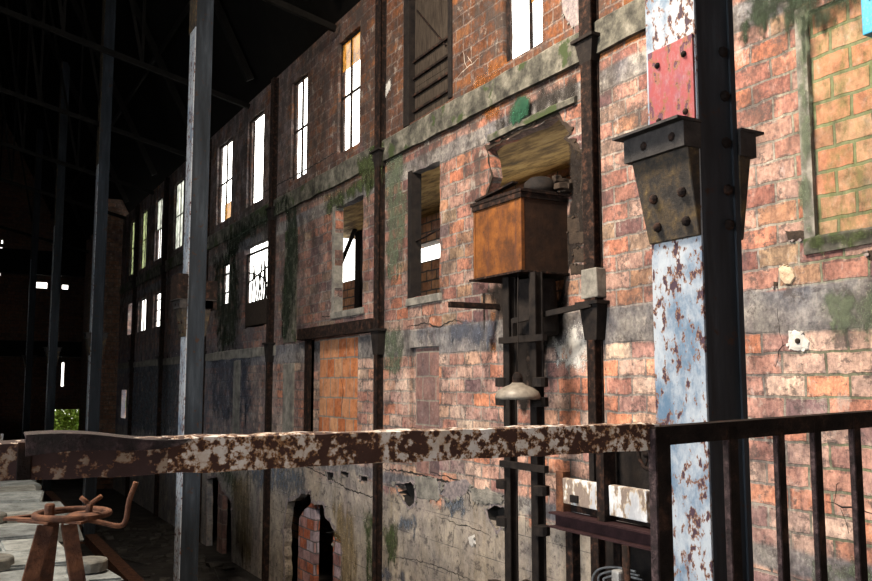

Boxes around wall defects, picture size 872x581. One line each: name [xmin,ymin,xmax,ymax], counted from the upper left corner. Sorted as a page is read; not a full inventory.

spalling [484,112,582,195]
water stain [552,327,587,369]
spalling [786,330,810,352]
water stain [232,467,305,562]
peeling [392,475,505,537]